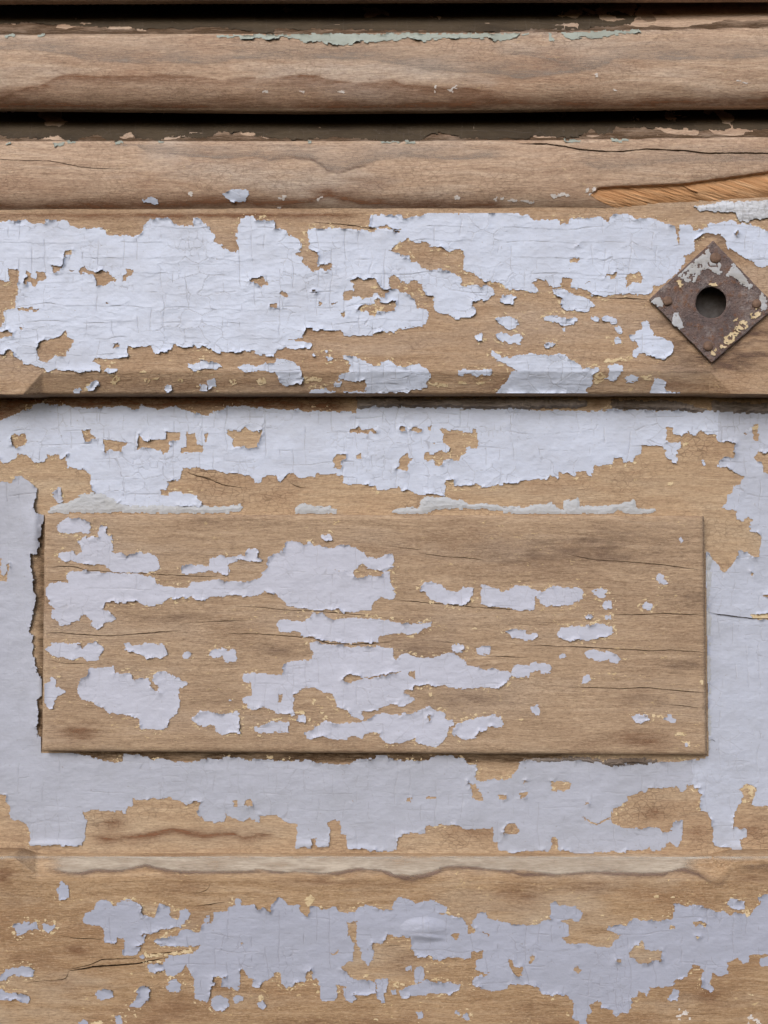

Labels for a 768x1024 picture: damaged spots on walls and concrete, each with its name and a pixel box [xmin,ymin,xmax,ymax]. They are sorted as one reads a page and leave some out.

crack [520,143,768,154]
rust [715,331,767,368]
peeling [0,189,768,853]
peeling [54,881,69,905]
peeling [8,917,59,941]
peeling [78,890,768,1024]
peeling [0,961,37,1003]